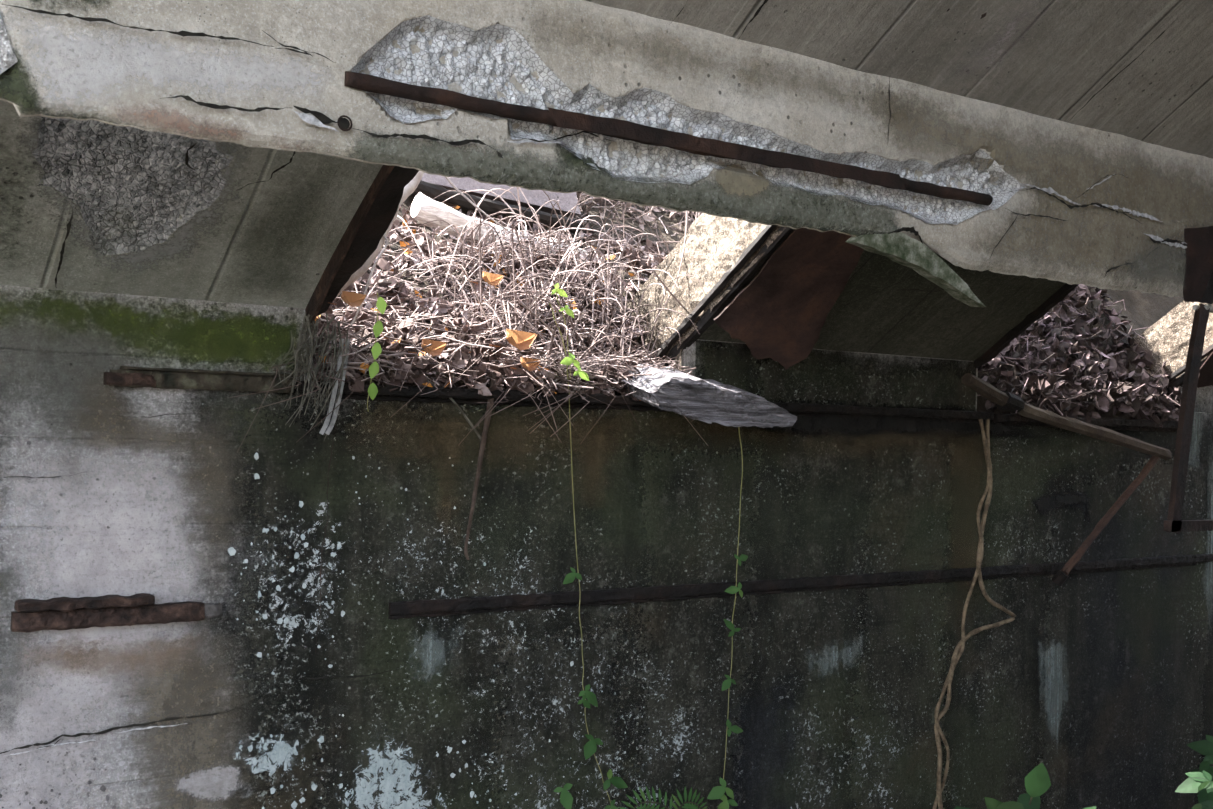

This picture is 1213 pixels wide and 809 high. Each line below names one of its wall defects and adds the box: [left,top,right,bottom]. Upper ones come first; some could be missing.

spalling [0,15,18,74]
crack [2,4,336,63]
flaking render [32,116,234,256]
crack [160,95,615,158]
spalling [351,15,1026,225]
peeling [846,232,986,307]
crack [990,174,1187,282]
leakage [0,293,298,604]
leakage [469,340,1089,809]
leakage [1029,407,1213,809]
crack [0,704,245,756]
leakage [0,620,447,809]